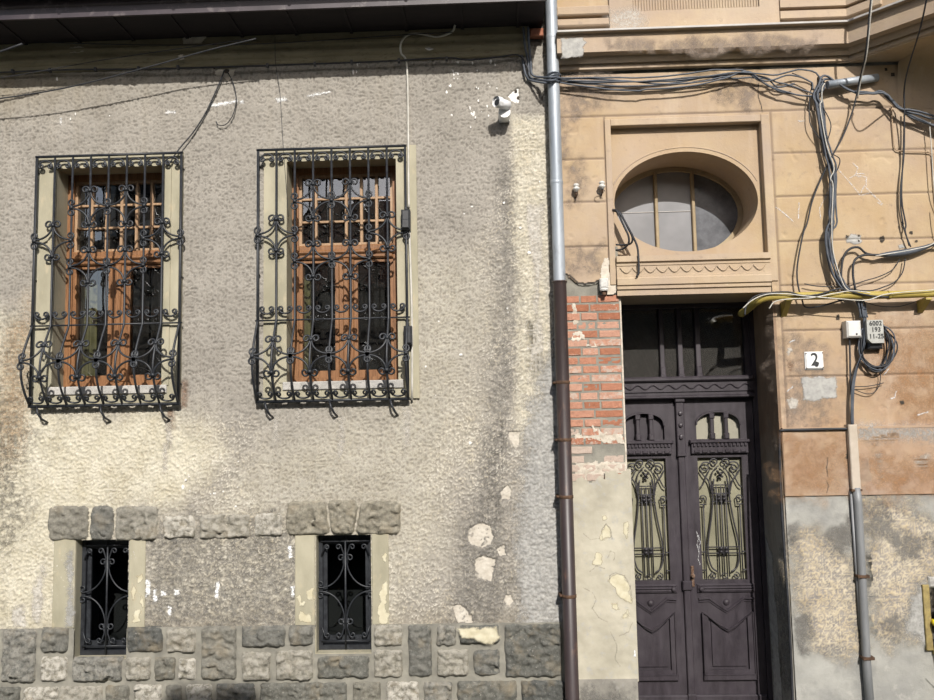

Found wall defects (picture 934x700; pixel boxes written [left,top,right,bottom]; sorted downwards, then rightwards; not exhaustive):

flaking render [567,258,627,481]
peeling [377,581,390,624]
peeling [453,605,473,623]
peeling [468,523,506,581]
peeling [609,574,633,618]
flaking render [790,527,861,664]
flaking render [862,495,934,651]